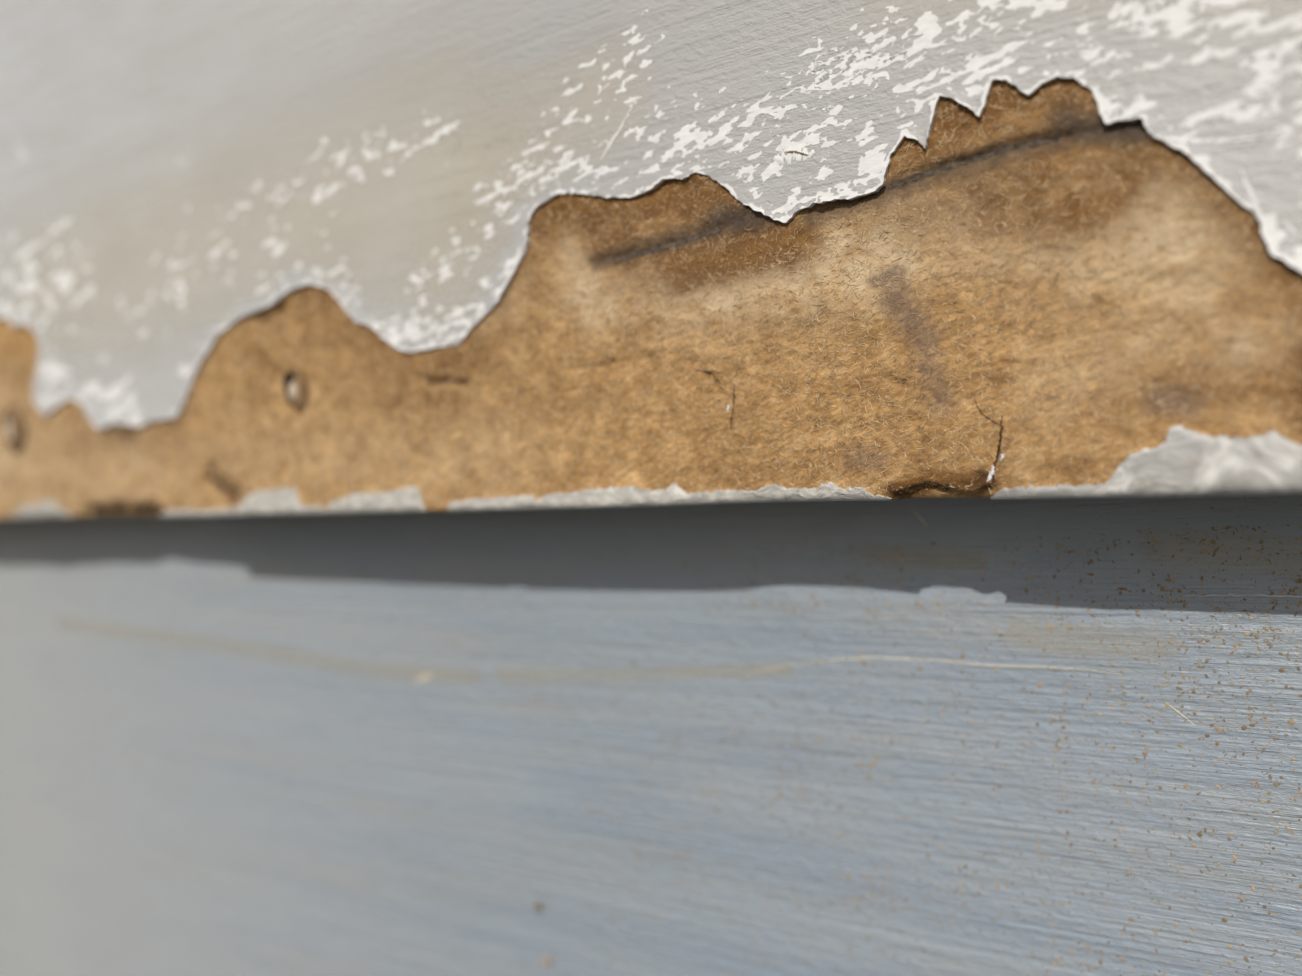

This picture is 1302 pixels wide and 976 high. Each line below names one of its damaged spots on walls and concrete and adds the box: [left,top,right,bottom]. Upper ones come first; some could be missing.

peeling [0,71,1302,520]